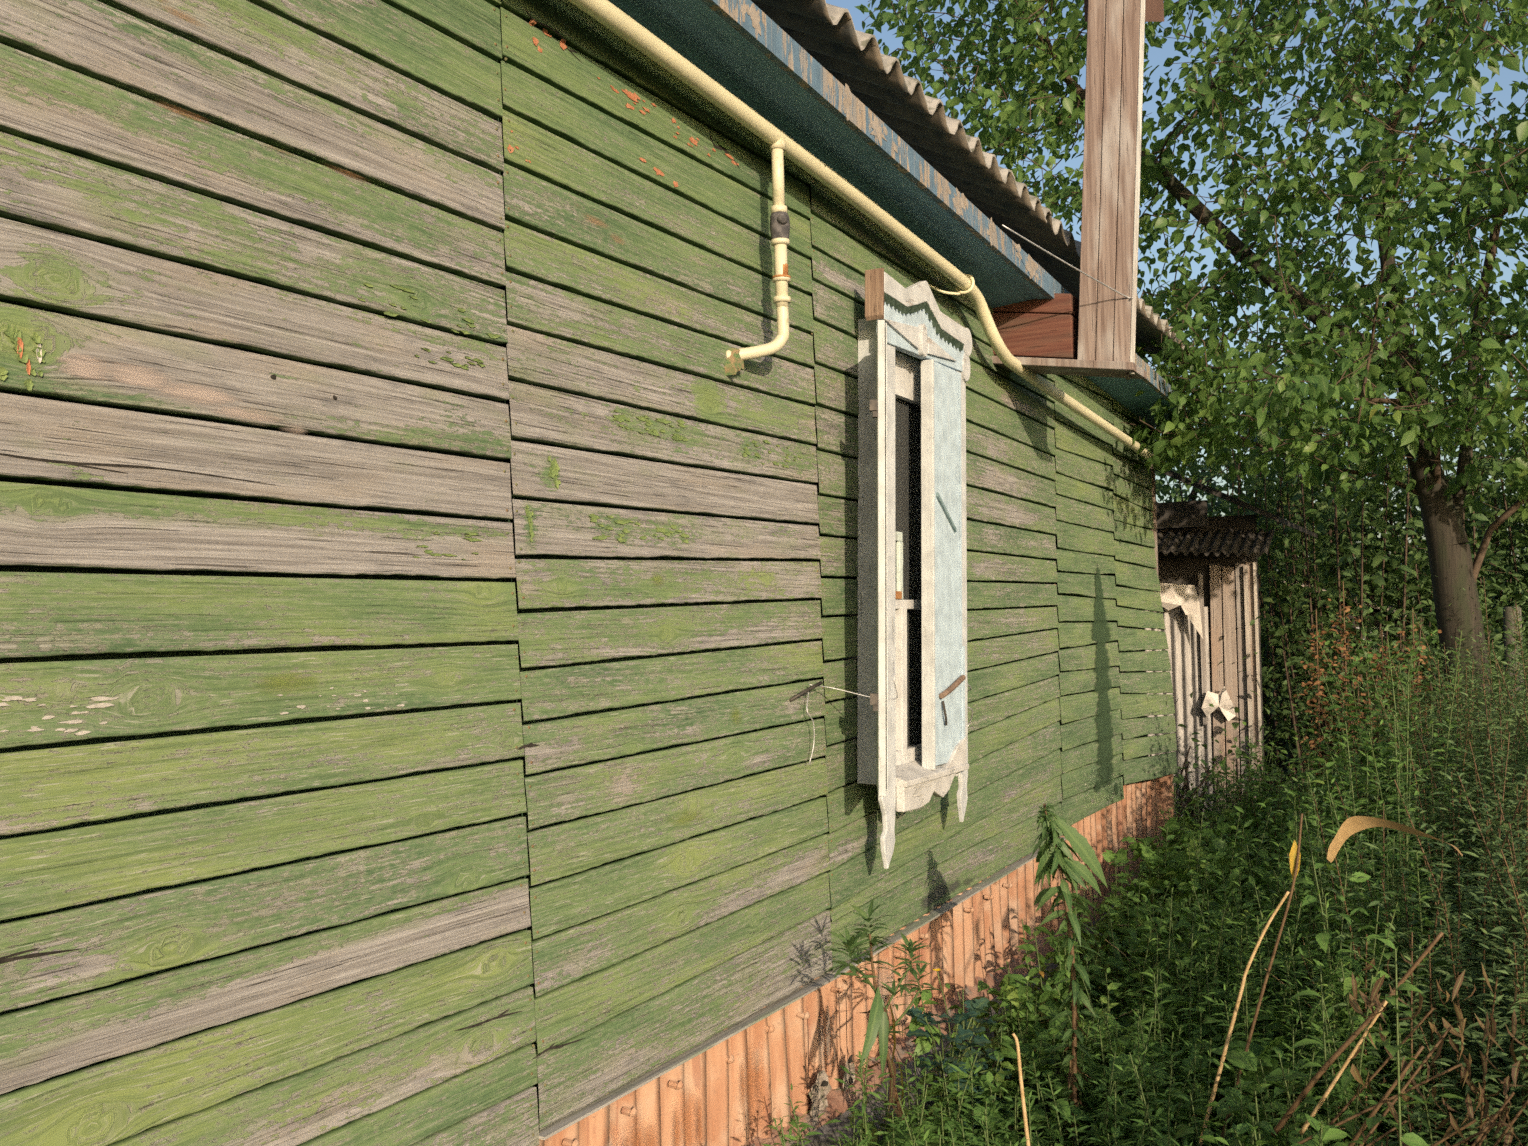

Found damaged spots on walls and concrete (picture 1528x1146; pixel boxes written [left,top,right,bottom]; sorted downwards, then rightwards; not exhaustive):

peeling [741,0,761,39]
peeling [597,77,657,115]
peeling [671,118,716,157]
peeling [843,83,898,154]
peeling [946,186,969,216]
peeling [987,217,995,246]
peeling [1016,244,1040,280]
peeling [0,323,271,421]
damp [1092,568,1119,795]
peeling [0,696,117,735]